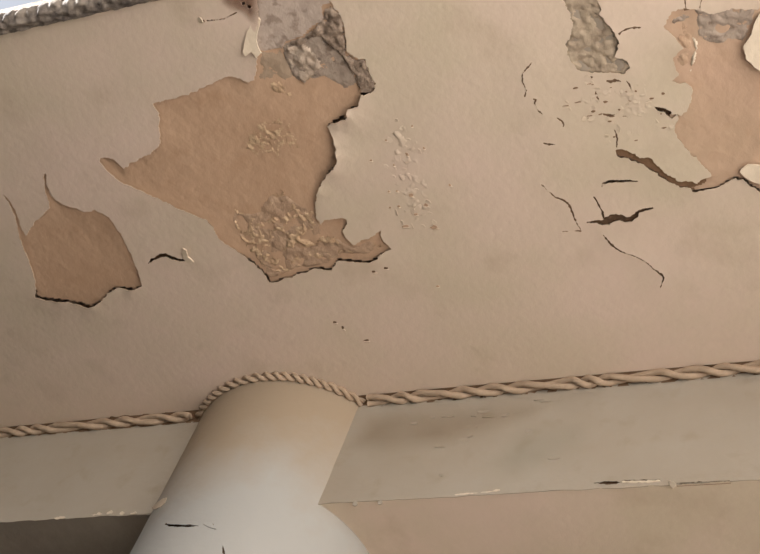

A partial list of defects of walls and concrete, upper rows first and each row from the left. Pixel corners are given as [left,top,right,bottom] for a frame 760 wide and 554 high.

peeling [100,0,391,281]
peeling [564,0,630,77]
crack [522,63,707,190]
peeling [664,8,760,190]
peeling [4,173,141,306]
crack [149,248,194,264]
crack [541,182,665,287]